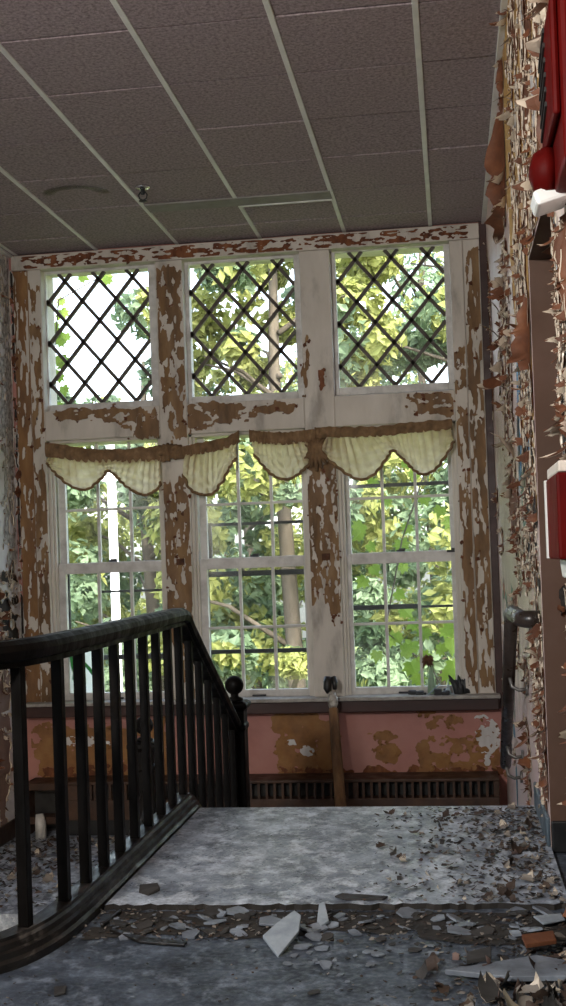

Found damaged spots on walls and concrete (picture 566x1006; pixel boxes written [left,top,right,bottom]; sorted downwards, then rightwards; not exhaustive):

peeling [0,225,468,641]
peeling [270,0,566,927]
peeling [25,662,52,702]
peeling [0,669,14,826]
peeling [31,722,54,778]
peeling [66,726,76,777]
peeling [87,716,167,776]
spalling [139,883,160,896]
spalling [259,911,301,958]